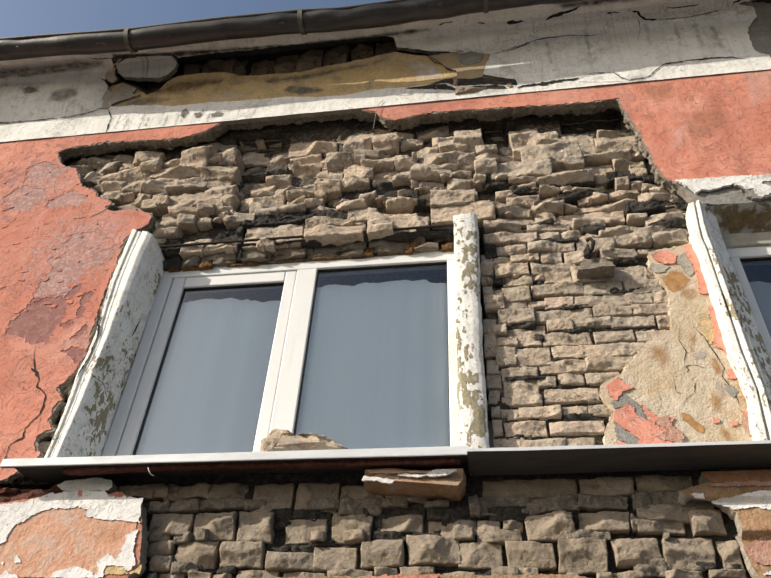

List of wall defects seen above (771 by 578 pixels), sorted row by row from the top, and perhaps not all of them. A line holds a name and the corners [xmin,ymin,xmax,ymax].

crack [607,0,771,41]
peeling [739,1,771,59]
spalling [99,41,517,109]
crack [517,57,746,88]
spalling [1,108,771,457]
crack [0,347,46,473]
spalling [0,469,771,578]